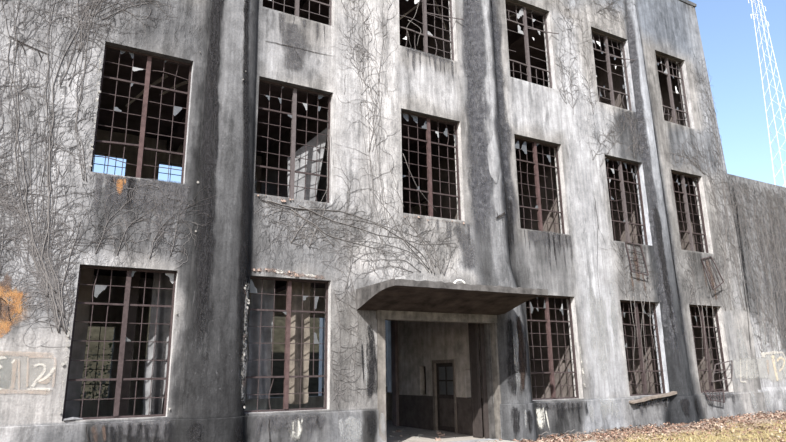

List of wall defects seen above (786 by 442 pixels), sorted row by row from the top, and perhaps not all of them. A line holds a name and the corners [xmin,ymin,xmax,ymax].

leakage [437,0,516,268]
leakage [94,174,190,231]
leakage [192,0,224,361]
leakage [236,0,251,365]
leakage [524,230,573,266]
corrosion [0,275,23,337]
flaking render [241,284,250,409]
leakage [361,325,378,399]
leakage [505,320,519,394]
leakage [92,417,171,442]
leakage [511,400,619,436]